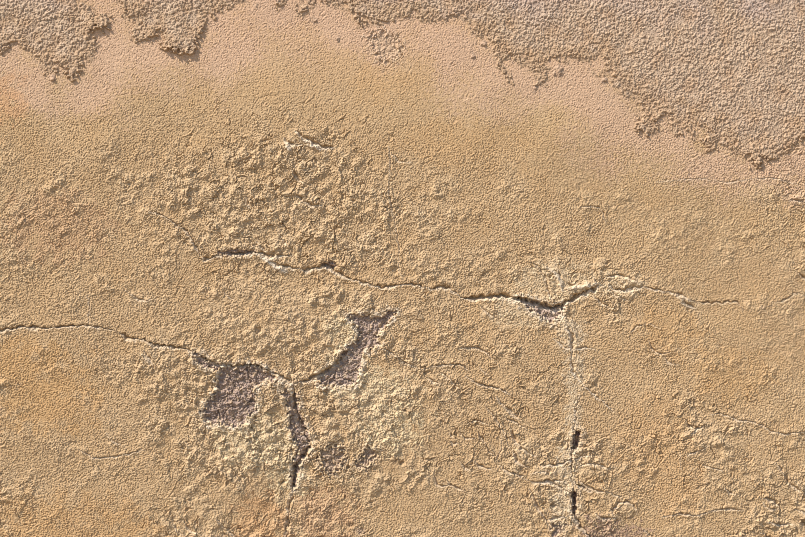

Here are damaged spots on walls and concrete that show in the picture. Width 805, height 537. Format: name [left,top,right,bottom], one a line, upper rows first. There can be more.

peeling [0,0,258,89]
peeling [272,0,805,170]
crack [0,294,353,537]
peeling [185,345,389,497]
peeling [310,301,404,396]
crack [148,144,805,537]